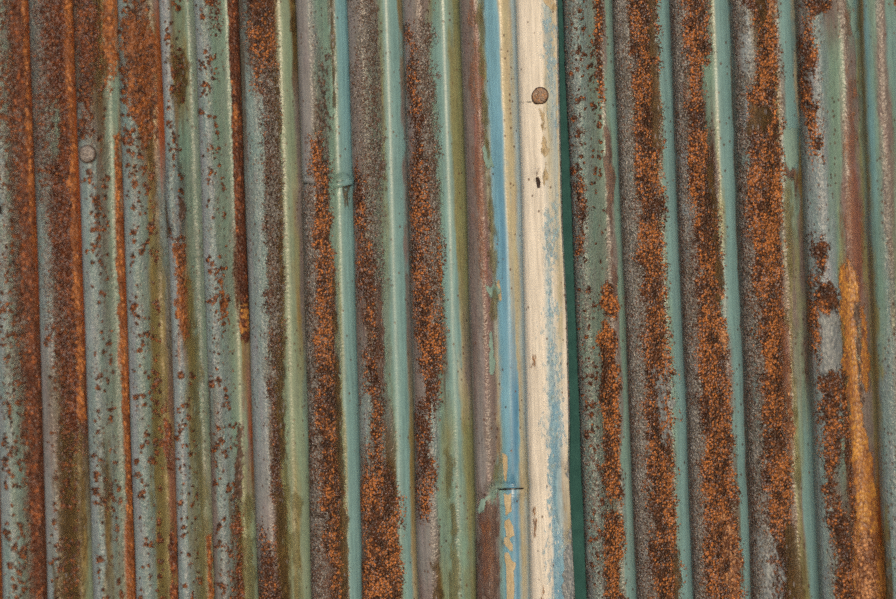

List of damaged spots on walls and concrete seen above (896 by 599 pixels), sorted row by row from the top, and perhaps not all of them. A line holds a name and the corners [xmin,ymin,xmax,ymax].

rust [0,0,291,599]
rust [301,130,350,599]
rust [346,0,450,599]
peeling [503,493,516,599]
rust [562,0,803,599]
rust [796,0,833,171]
rust [803,231,860,599]